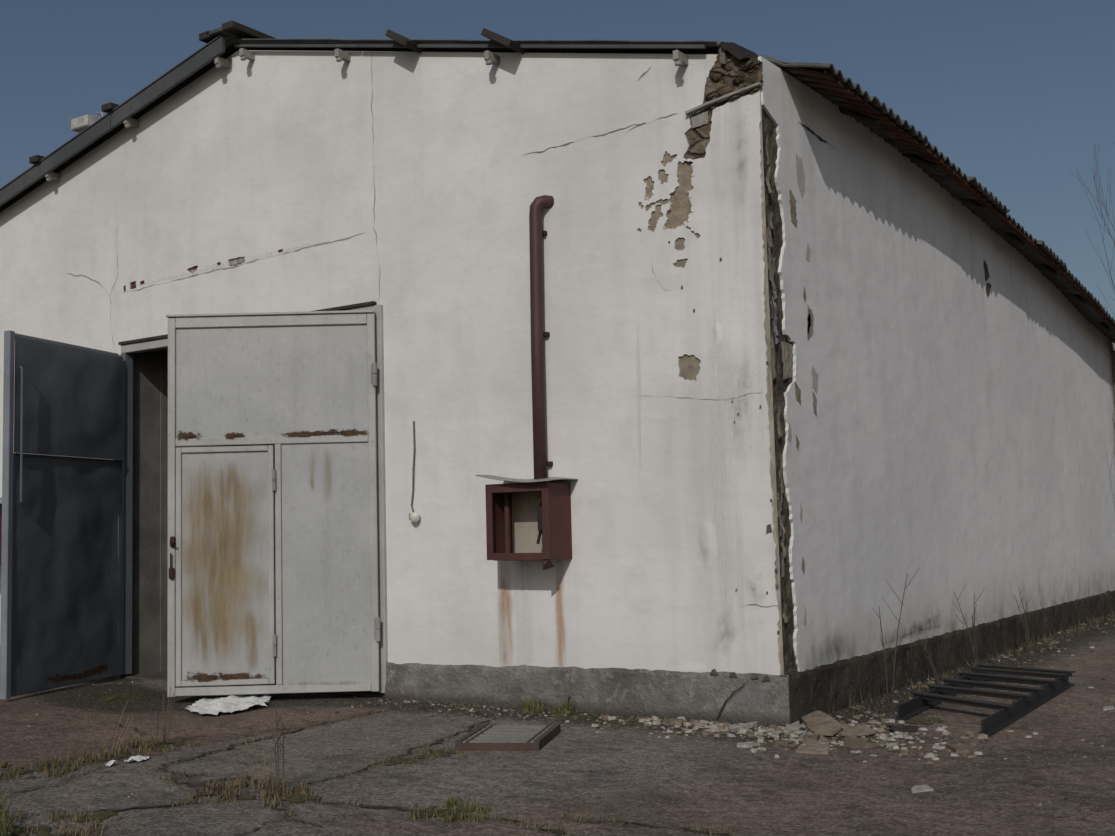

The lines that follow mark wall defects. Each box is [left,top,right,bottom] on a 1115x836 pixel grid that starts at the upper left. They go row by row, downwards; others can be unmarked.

crack [522,113,676,156]
spalling [638,47,763,268]
spalling [124,233,362,293]
peeling [679,354,701,381]
spalling [751,108,818,681]
corrosion [177,431,199,440]
corrosion [281,429,367,437]